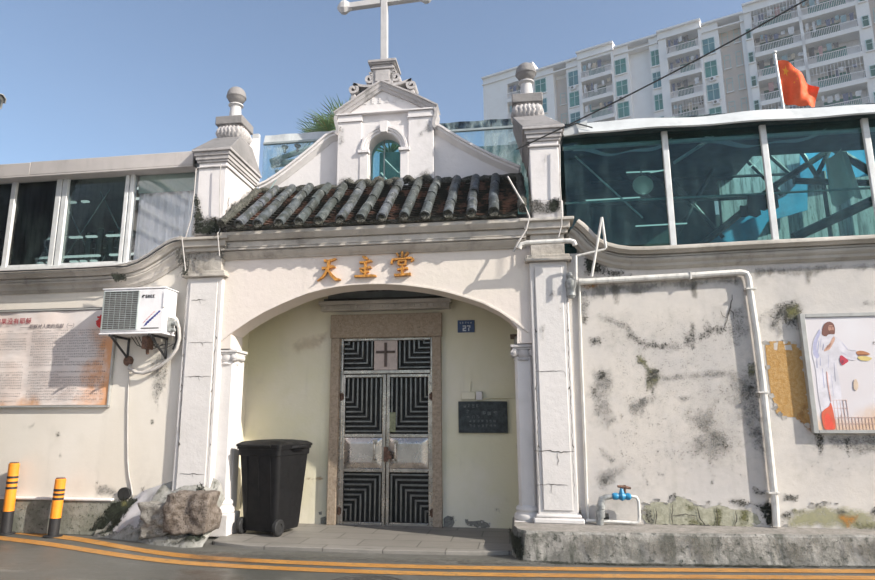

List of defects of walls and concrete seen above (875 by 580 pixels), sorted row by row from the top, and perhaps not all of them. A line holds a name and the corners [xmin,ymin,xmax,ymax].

damp [606,309,744,349]
damp [758,299,803,333]
damp [591,371,616,422]
damp [630,355,764,451]
peeling [762,340,811,430]
damp [693,411,731,459]
damp [90,486,138,536]
flaking render [641,496,764,527]
flaking render [782,501,875,529]